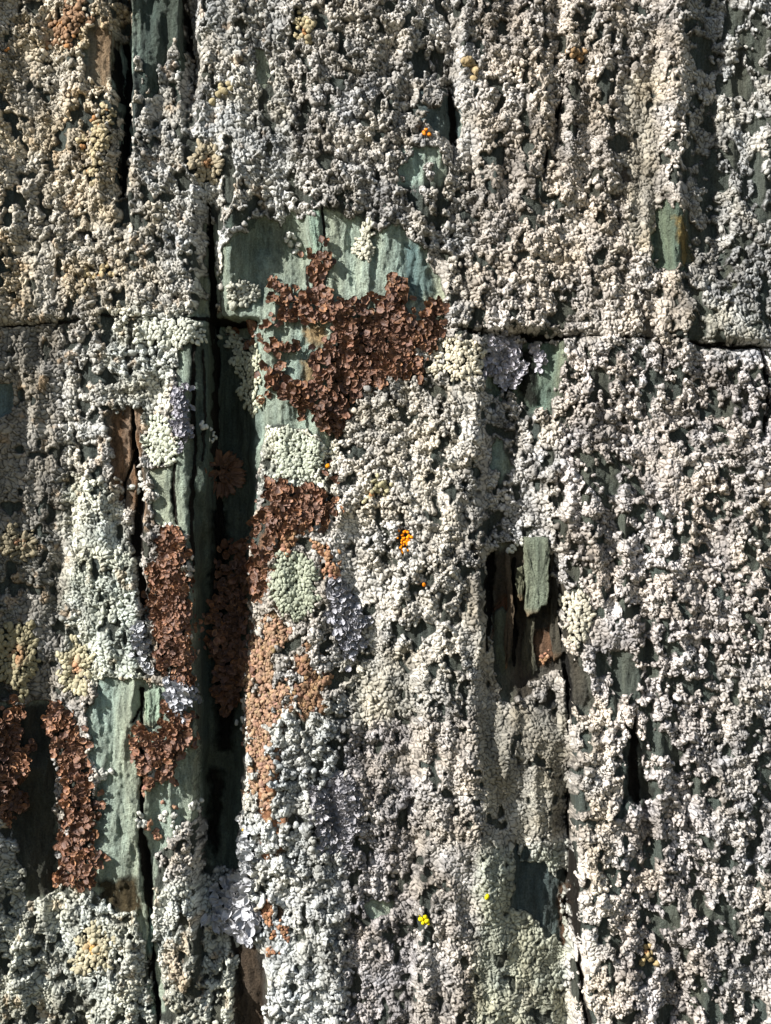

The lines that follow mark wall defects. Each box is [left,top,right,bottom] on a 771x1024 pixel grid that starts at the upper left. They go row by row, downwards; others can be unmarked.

crack [123,406,147,620]
crack [170,203,258,581]